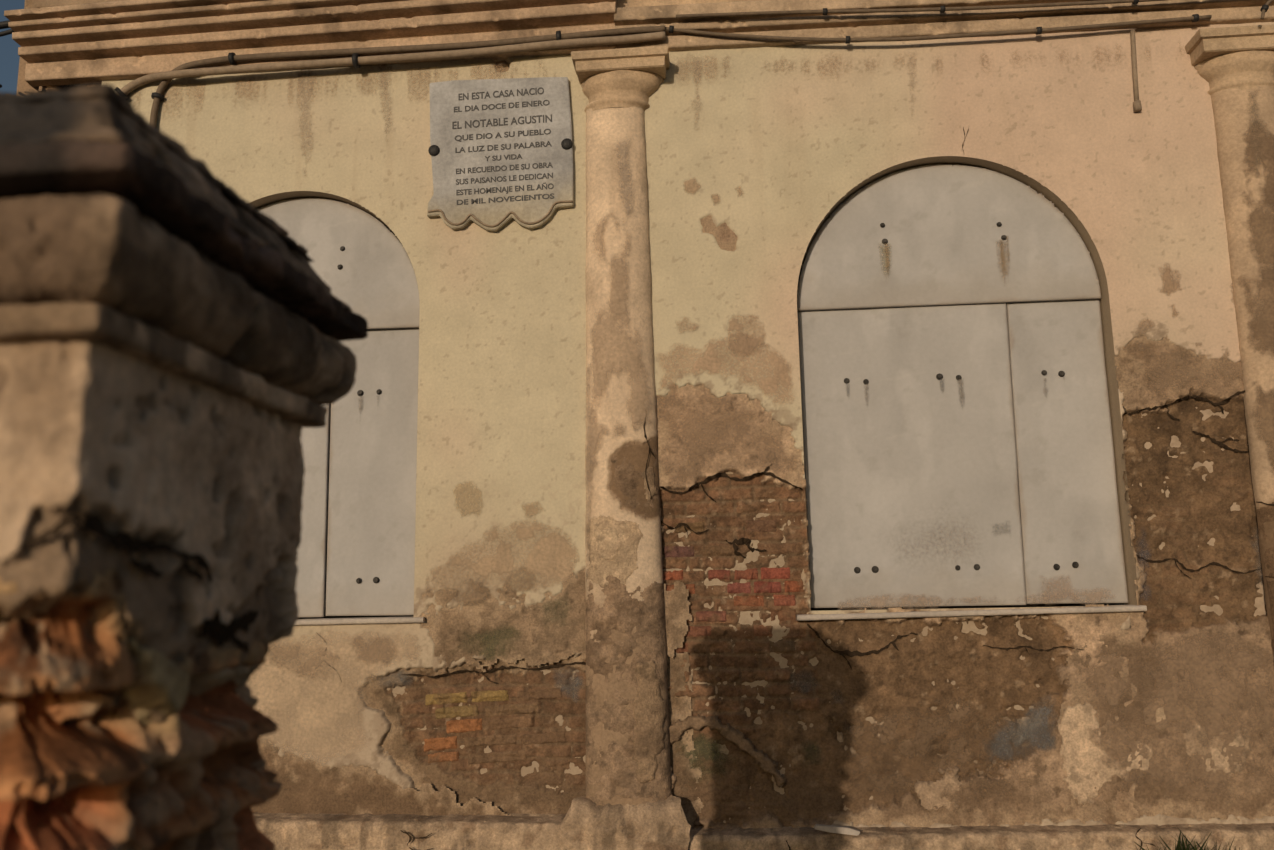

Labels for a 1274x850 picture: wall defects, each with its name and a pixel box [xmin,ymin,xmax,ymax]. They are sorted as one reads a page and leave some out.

water stain [587,221,648,481]
peeling [685,179,699,193]
flaking render [701,195,738,251]
peeling [1162,267,1179,294]
water stain [1243,94,1274,352]
crack [643,412,803,558]
water stain [1255,388,1274,466]
flaking render [0,316,1274,850]